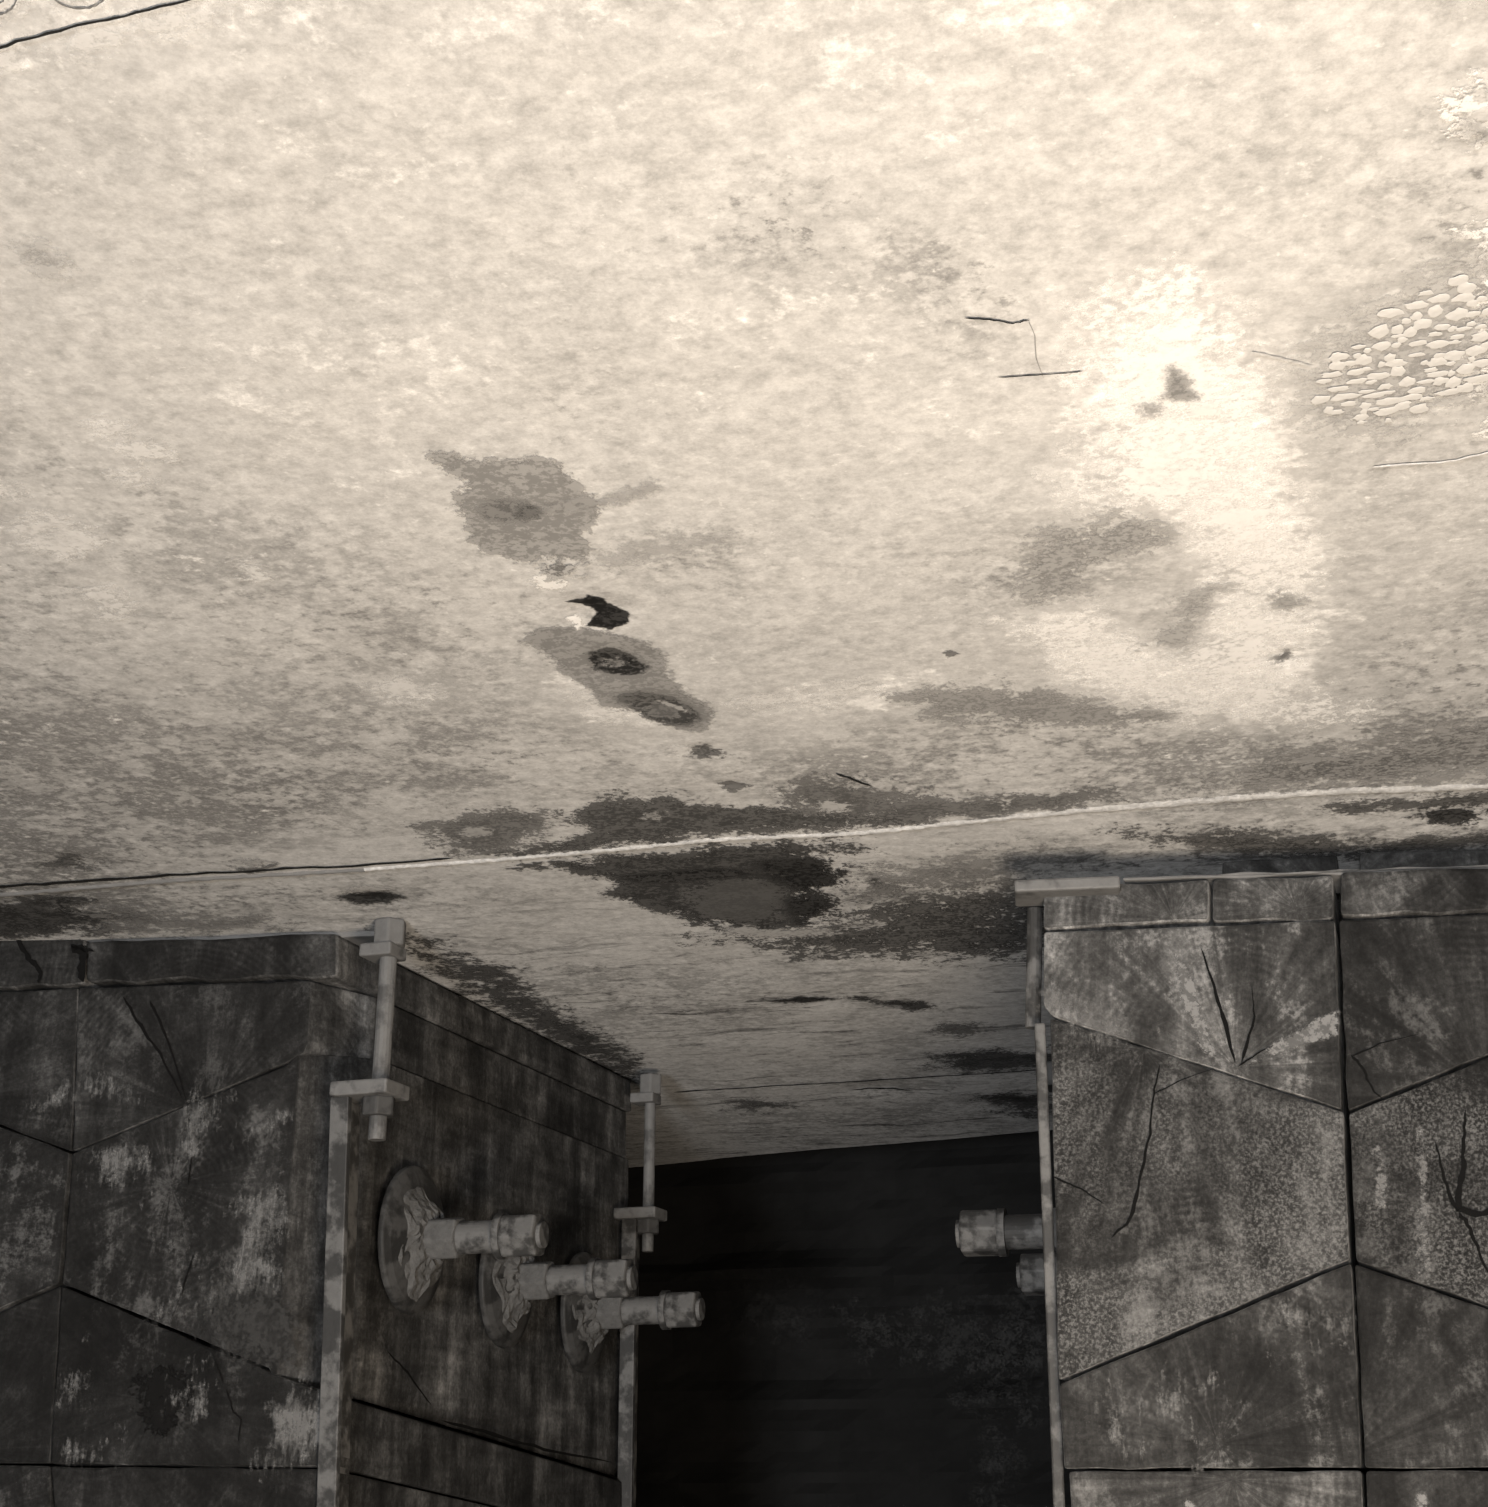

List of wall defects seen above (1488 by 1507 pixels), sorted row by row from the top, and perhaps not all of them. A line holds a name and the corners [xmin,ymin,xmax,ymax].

crack [0,0,213,69]
damp [423,450,605,584]
damp [732,252,1488,816]
damp [359,678,445,705]
spalling [530,573,700,726]
damp [519,626,715,732]
spalling [666,744,726,759]
spalling [718,781,749,793]
damp [409,771,1488,861]
damp [676,838,1080,967]